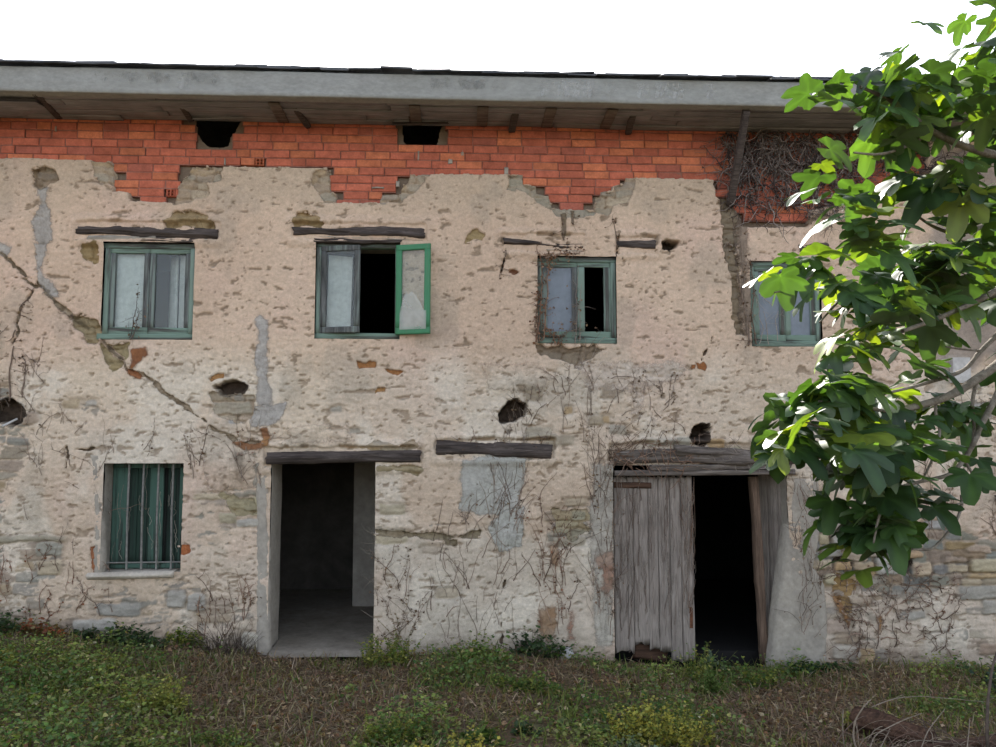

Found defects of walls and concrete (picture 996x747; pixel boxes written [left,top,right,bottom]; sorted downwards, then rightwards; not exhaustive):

spalling [163,165,223,229]
spalling [292,211,324,228]
spalling [312,167,338,203]
spalling [380,174,430,204]
spalling [507,175,636,218]
crack [0,252,73,344]
crack [104,342,260,445]
spalling [832,556,856,614]